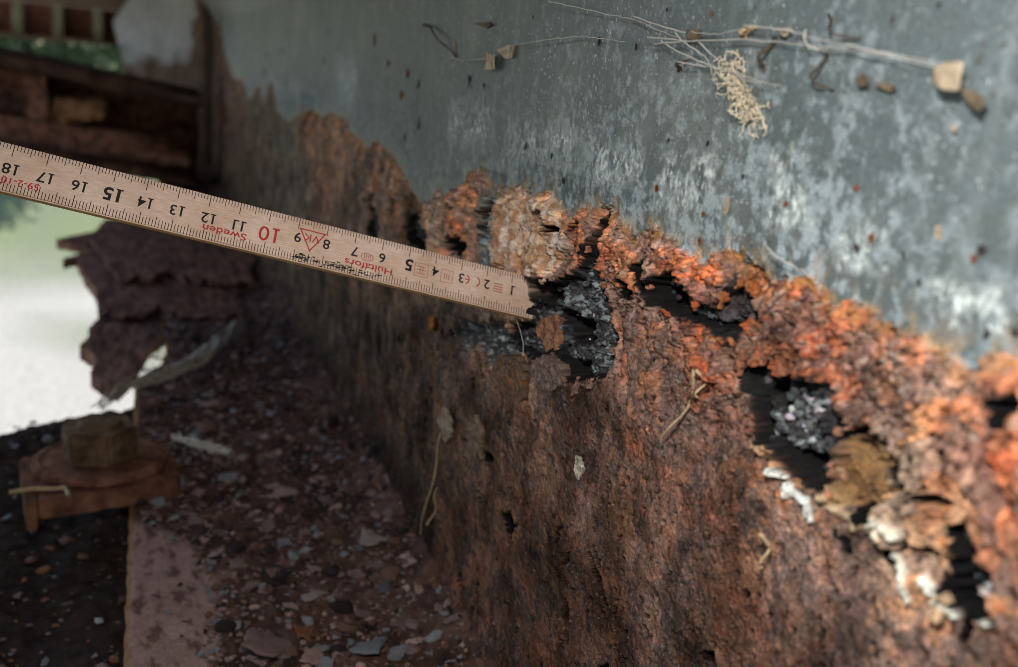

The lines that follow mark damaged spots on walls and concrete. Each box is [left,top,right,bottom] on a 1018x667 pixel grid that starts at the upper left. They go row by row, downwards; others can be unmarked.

rust [610,206,734,276]
peeling [717,276,762,309]
spalling [454,317,529,369]
rust [491,314,571,407]
rust [772,274,1018,382]
rust [437,406,485,460]
rust [573,455,586,480]
spalling [793,427,899,523]
rust [359,528,387,546]
peeling [926,592,955,623]
peeling [985,593,1017,618]
rust [242,625,324,665]